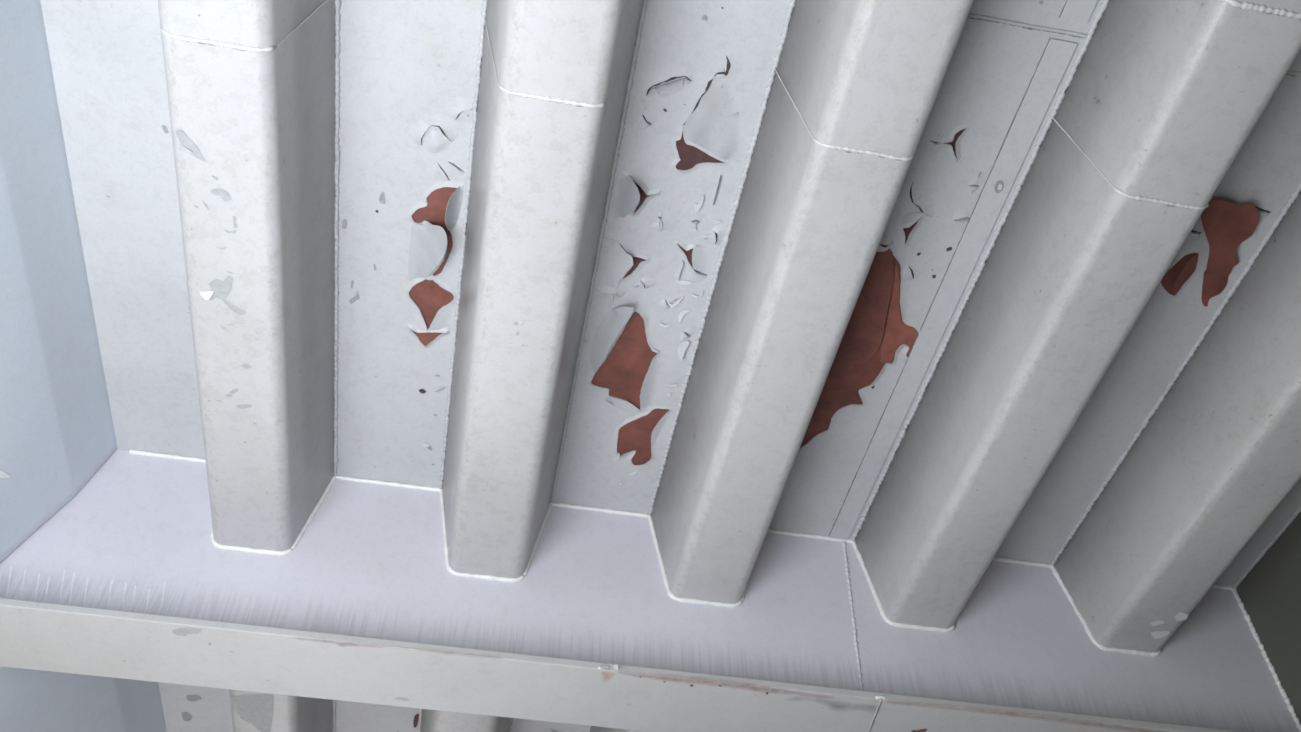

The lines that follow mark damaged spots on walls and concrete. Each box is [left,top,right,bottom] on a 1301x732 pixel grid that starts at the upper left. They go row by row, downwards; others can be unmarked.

peeling [404,180,466,349]
peeling [585,54,746,486]
peeling [799,212,926,451]
peeling [1157,196,1275,307]